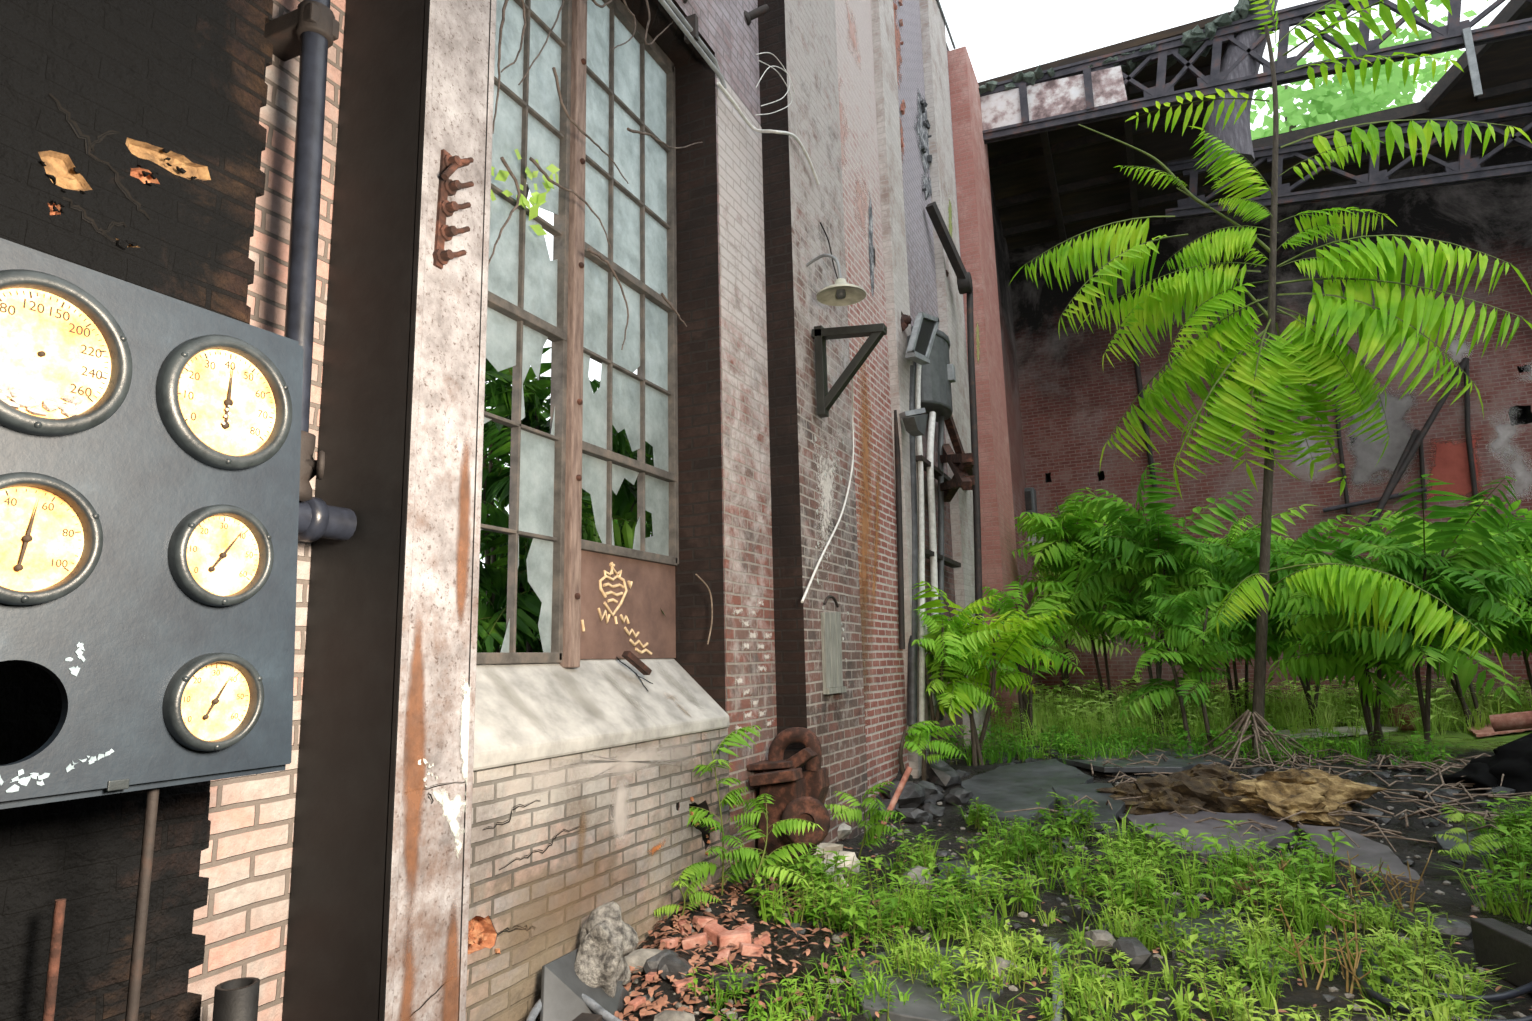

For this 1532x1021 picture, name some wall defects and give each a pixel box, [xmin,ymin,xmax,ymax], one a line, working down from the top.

spalling [38,150,92,215]
spalling [126,137,211,186]
spalling [1508,405,1532,426]
peeling [1428,436,1481,497]
corrosion [457,452,470,618]
corrosion [405,630,425,888]
spalling [468,916,500,954]
corrosion [400,940,413,1021]
corrosion [443,917,459,1021]